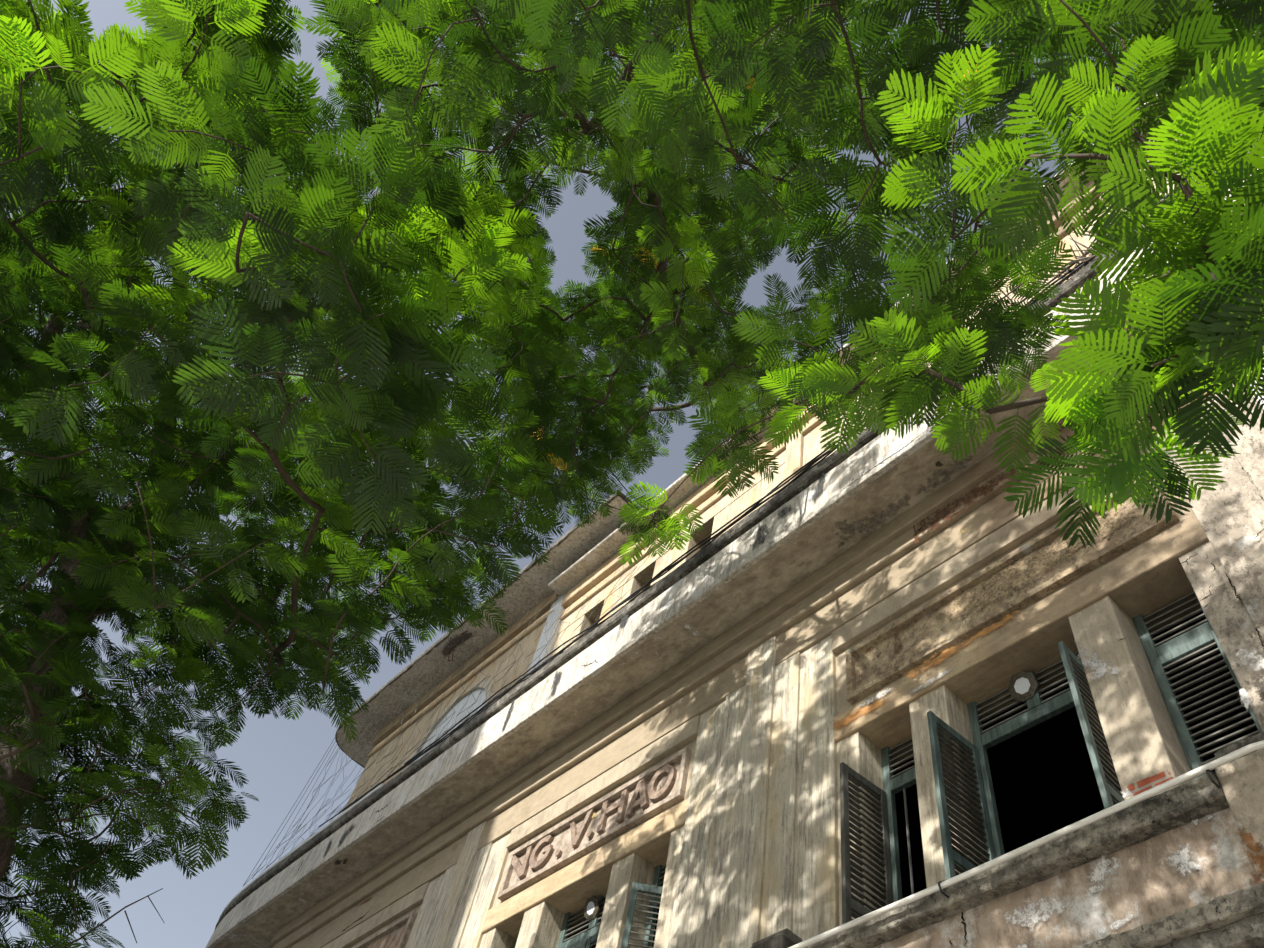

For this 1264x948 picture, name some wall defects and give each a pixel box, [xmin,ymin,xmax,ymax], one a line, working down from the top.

crack [1179,555,1264,649]
corrosion [1238,828,1264,884]
crack [949,912,967,947]